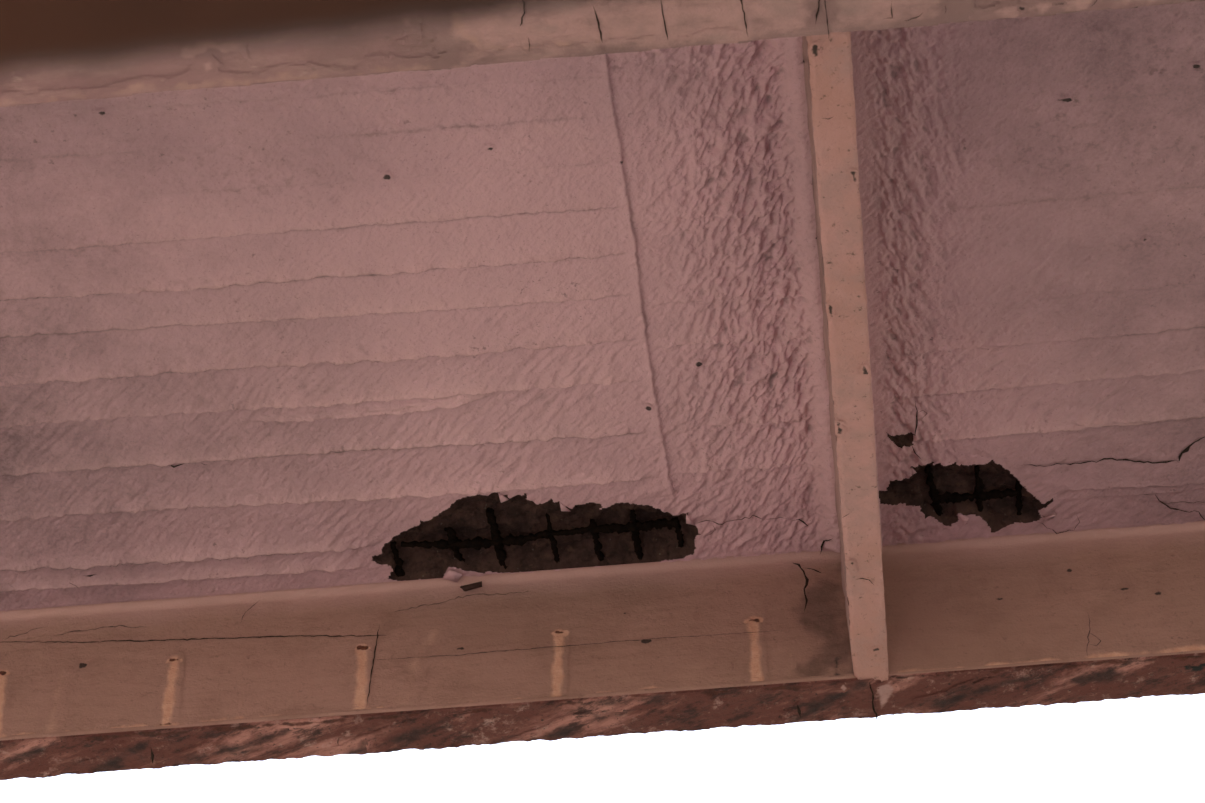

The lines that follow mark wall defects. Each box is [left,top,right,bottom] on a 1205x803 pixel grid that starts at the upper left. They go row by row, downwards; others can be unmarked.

crack [816,0,829,35]
crack [1030,437,1204,467]
spalling [372,492,701,591]
crack [696,513,850,611]
spalling [879,460,1056,533]
crack [1143,494,1205,520]